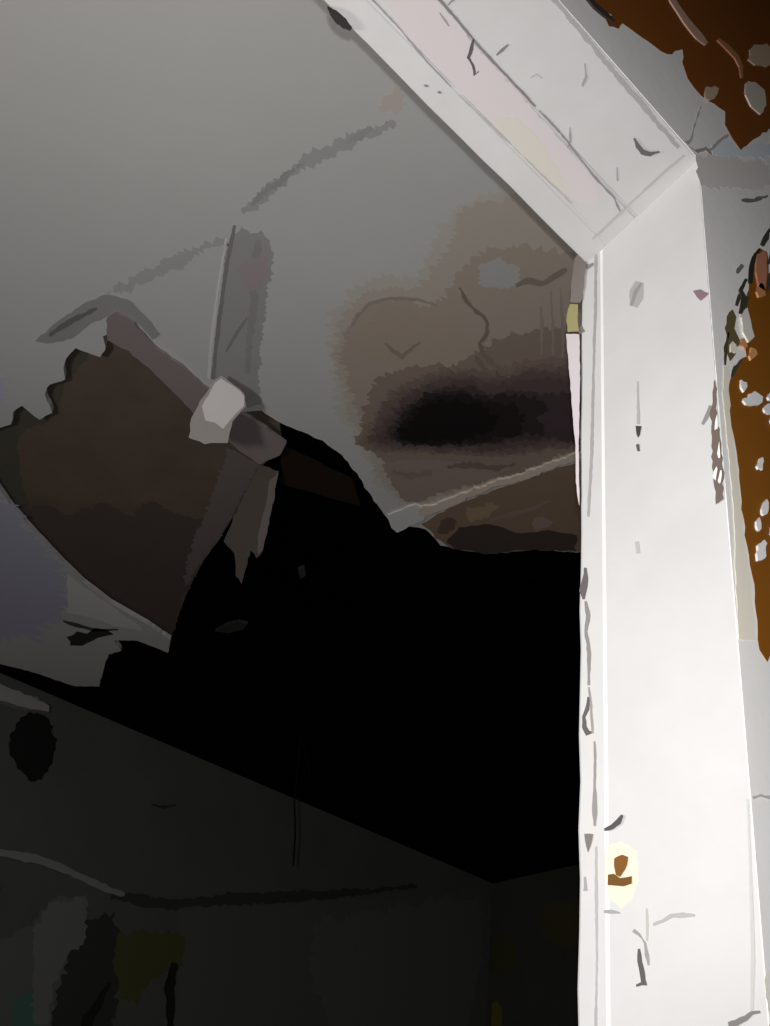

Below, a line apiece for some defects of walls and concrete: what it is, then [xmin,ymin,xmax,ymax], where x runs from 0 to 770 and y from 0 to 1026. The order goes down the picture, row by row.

peeling [586,0,770,150]
leakage [325,185,582,508]
leakage [446,524,578,554]